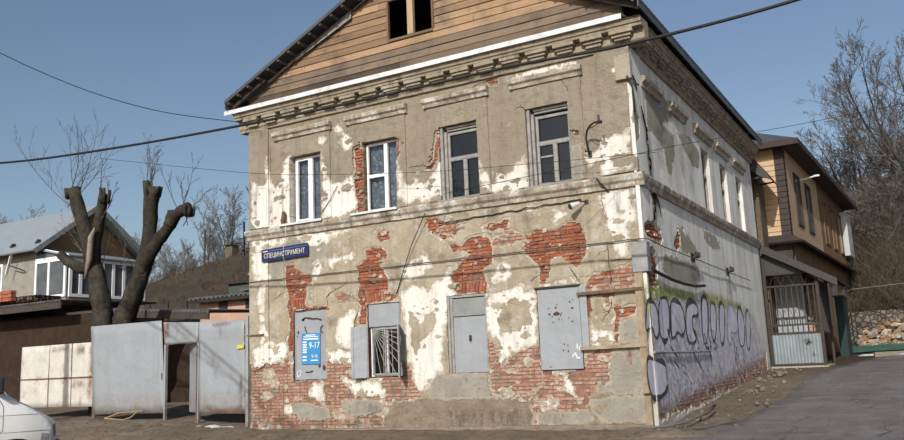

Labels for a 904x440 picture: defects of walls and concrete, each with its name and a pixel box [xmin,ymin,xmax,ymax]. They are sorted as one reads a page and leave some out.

peeling [317,120,368,219]
peeling [396,130,443,205]
peeling [577,127,633,180]
spalling [250,153,662,429]